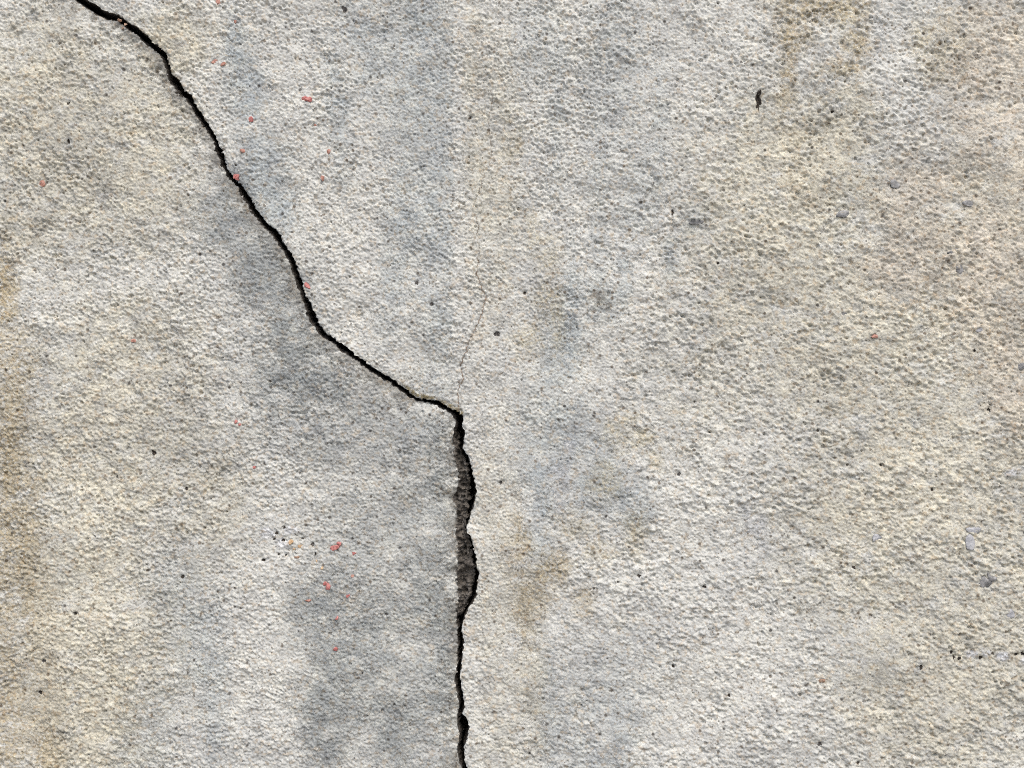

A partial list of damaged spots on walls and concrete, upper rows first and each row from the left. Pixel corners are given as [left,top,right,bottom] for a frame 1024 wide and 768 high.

crack [72,0,493,768]